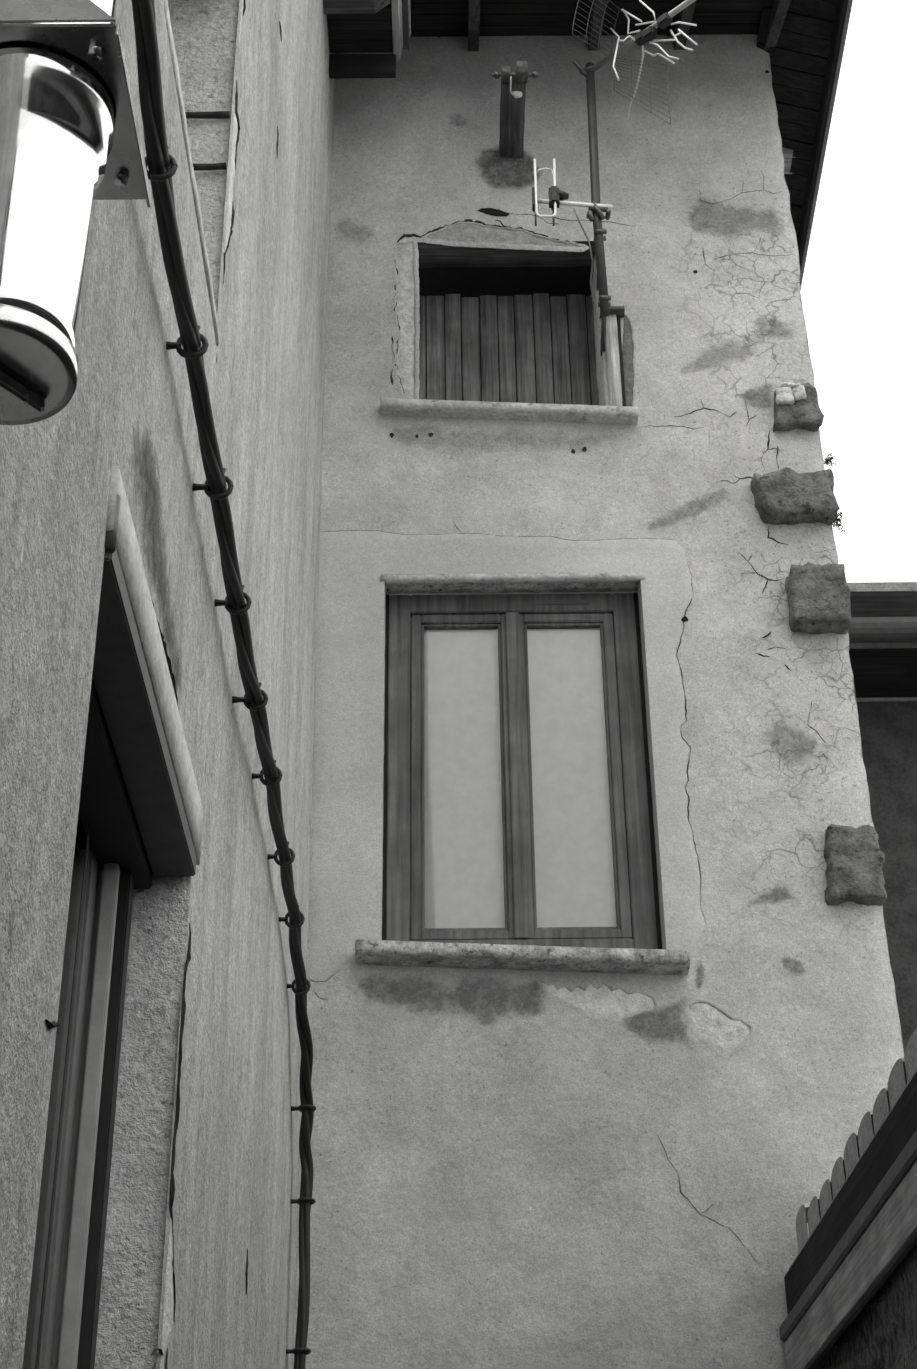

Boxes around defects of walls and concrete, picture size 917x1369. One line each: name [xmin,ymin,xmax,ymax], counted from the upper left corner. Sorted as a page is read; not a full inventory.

damp [481,150,539,188]
crack [699,171,783,208]
crack [702,238,791,270]
crack [741,527,787,593]
crack [756,632,790,670]
crack [322,524,705,918]
damp [361,980,539,1020]
spalling [683,998,755,1058]
crack [656,1134,755,1260]